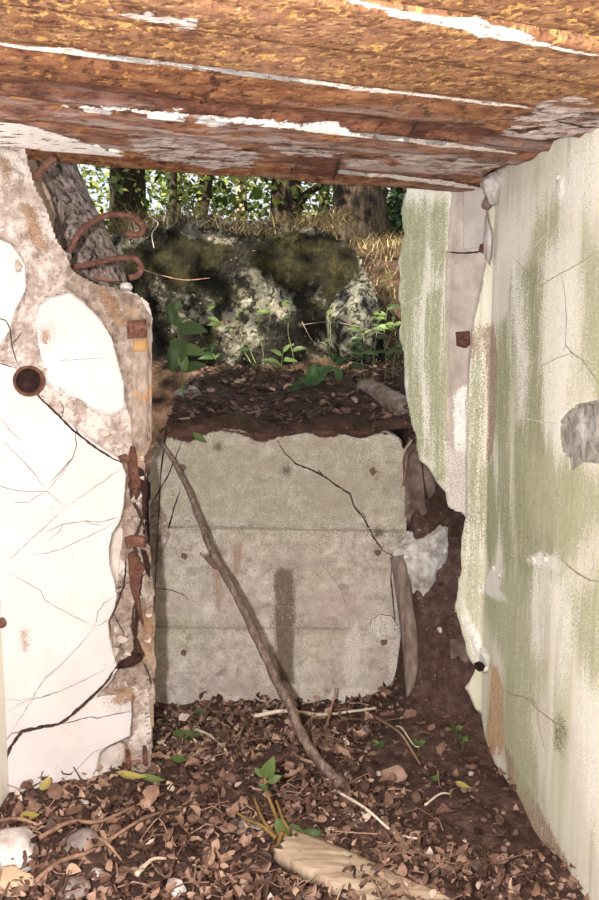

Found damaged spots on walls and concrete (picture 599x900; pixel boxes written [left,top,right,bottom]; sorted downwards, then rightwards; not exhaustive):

peeling [107,9,199,31]
peeling [146,108,230,127]
peeling [269,145,501,174]
leakage [417,190,459,488]
leakage [455,125,599,859]
spalling [560,400,599,470]
crack [0,391,190,760]
leakage [250,566,298,685]
crack [277,440,398,676]
rust [111,686,135,707]